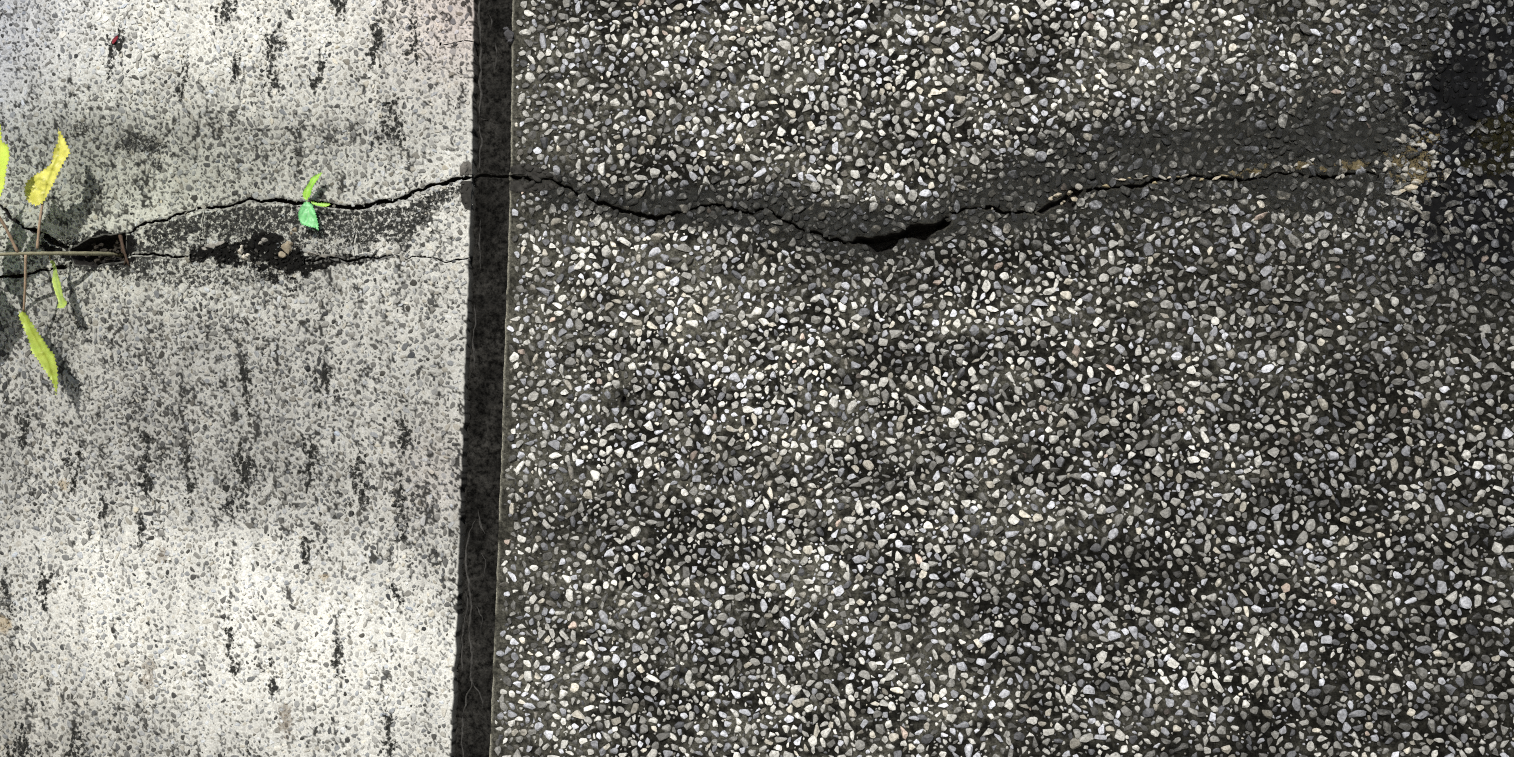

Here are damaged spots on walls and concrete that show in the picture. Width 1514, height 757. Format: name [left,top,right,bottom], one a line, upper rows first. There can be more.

crack [0,202,74,280]
crack [126,172,849,265]
crack [943,204,1035,222]
crack [1082,170,1379,194]
spalling [0,0,498,757]